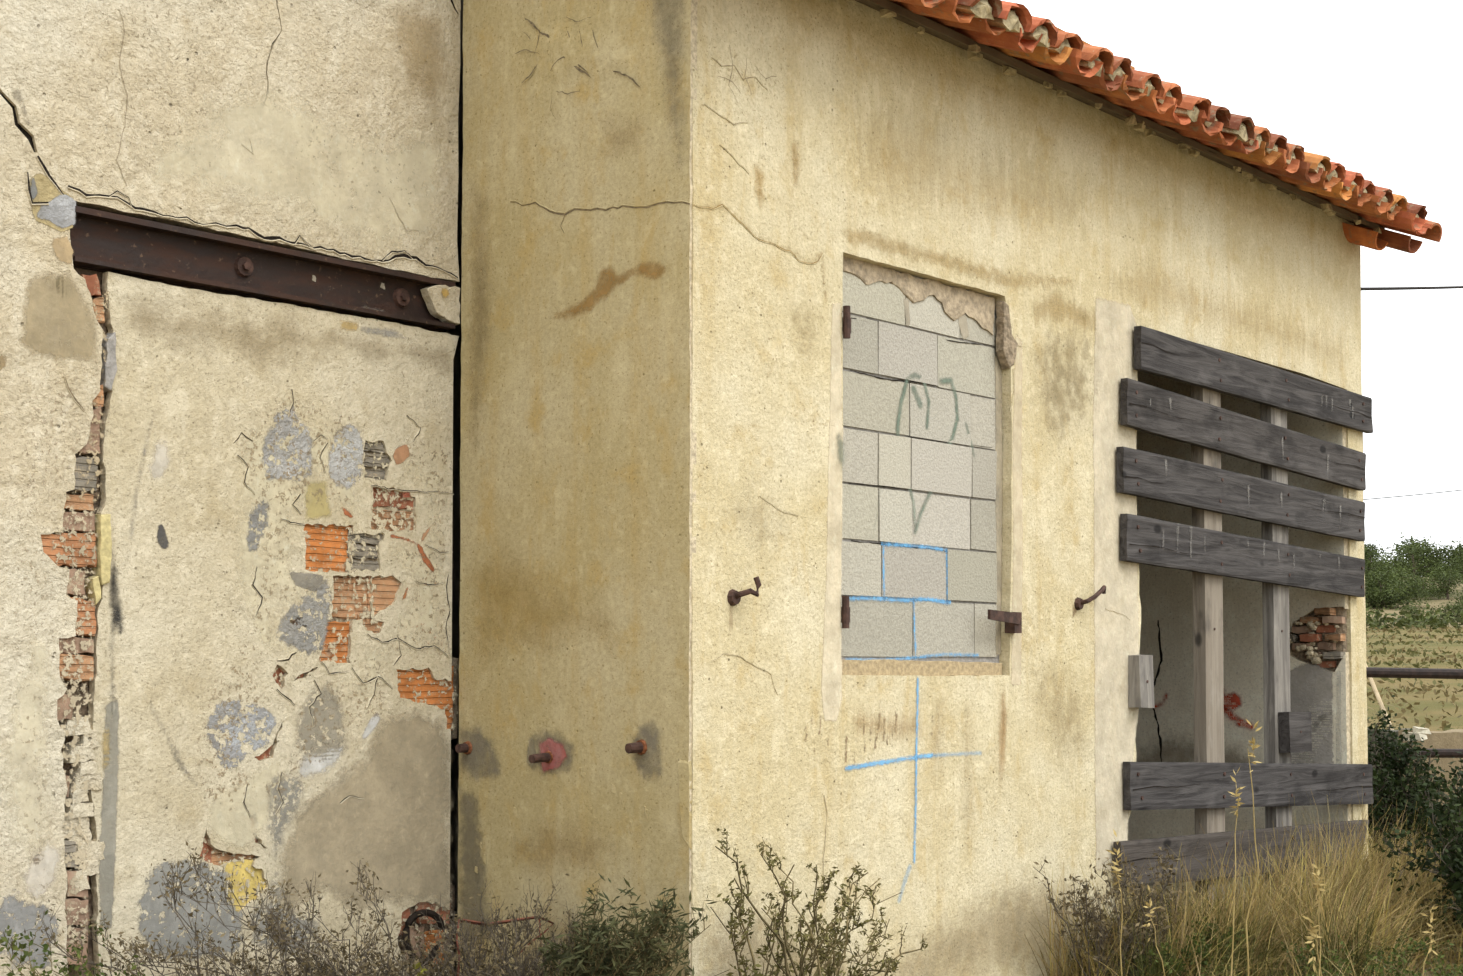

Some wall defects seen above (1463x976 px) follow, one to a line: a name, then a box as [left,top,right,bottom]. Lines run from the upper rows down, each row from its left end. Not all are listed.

crack [0,9,458,280]
crack [704,51,775,175]
crack [510,200,824,265]
flaking render [24,172,117,976]
flaking render [200,400,459,807]
flaking render [1290,607,1347,672]
flaking render [200,814,267,911]